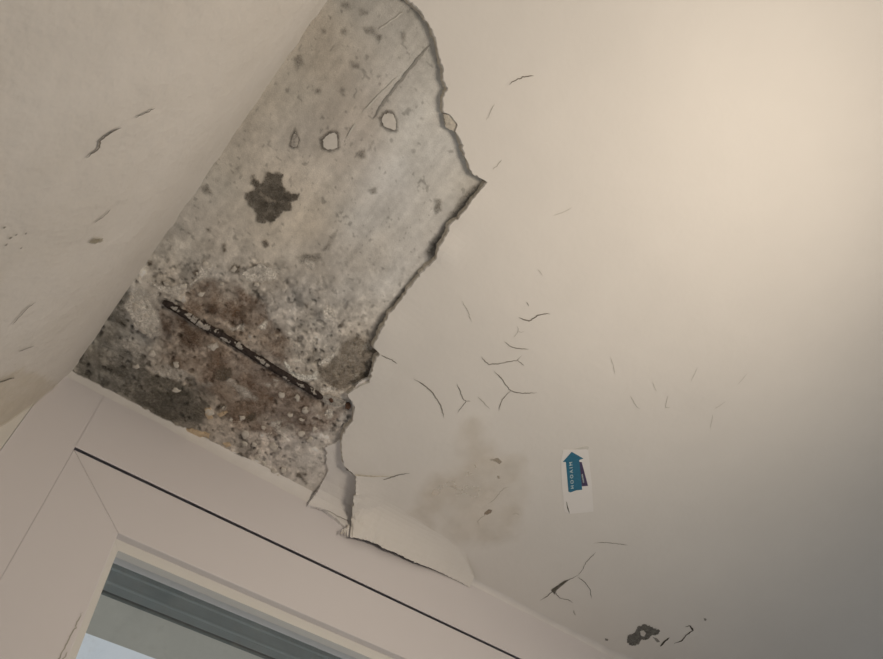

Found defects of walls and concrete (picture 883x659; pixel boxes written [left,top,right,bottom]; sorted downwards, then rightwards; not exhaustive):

spalling [73,0,483,492]
leakage [122,265,213,338]
leakage [107,362,202,420]
corrosion [203,350,334,435]
crack [414,303,548,417]
crack [541,542,624,601]
peeling [627,624,660,646]